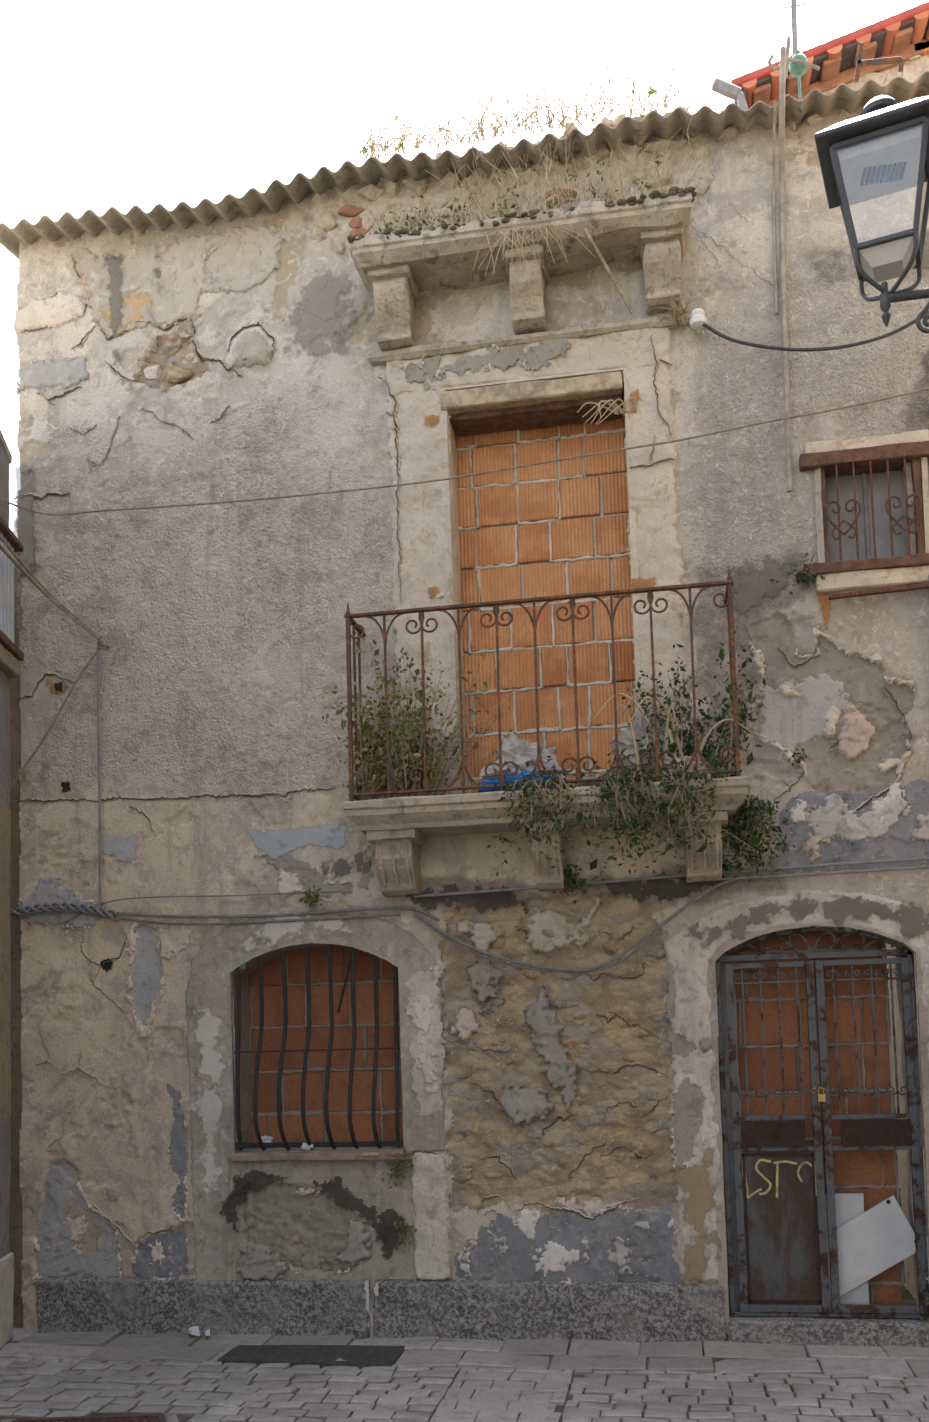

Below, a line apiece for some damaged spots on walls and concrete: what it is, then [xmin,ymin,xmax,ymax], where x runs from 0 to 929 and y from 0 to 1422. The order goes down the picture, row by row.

crack [41,386,80,405]
crack [24,256,247,382]
peeling [399,337,571,390]
peeling [746,611,929,875]
peeling [252,851,375,902]
crack [80,926,133,1028]
peeling [110,918,191,1040]
peeling [664,963,712,1058]
peeling [668,1077,707,1172]
peeling [31,1084,191,1284]
peeling [454,1199,683,1284]